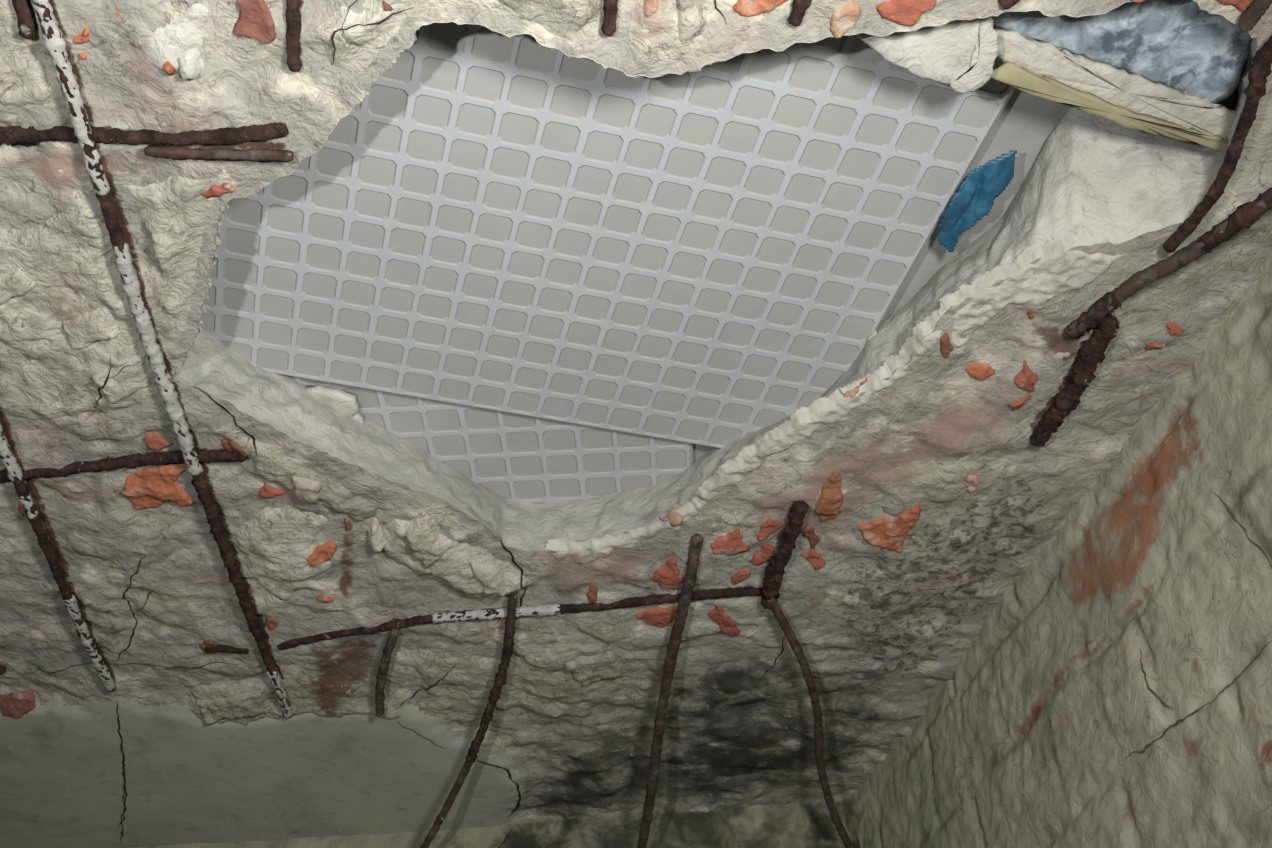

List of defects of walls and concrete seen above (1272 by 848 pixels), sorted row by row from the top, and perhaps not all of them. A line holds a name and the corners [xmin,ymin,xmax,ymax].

rust [340,536,353,595]
spalling [0,0,853,848]
spalling [173,0,1272,563]
rust [1039,327,1077,360]
peeling [1072,403,1199,601]
crack [116,703,127,840]
rust [312,640,374,714]
water stain [550,664,873,848]